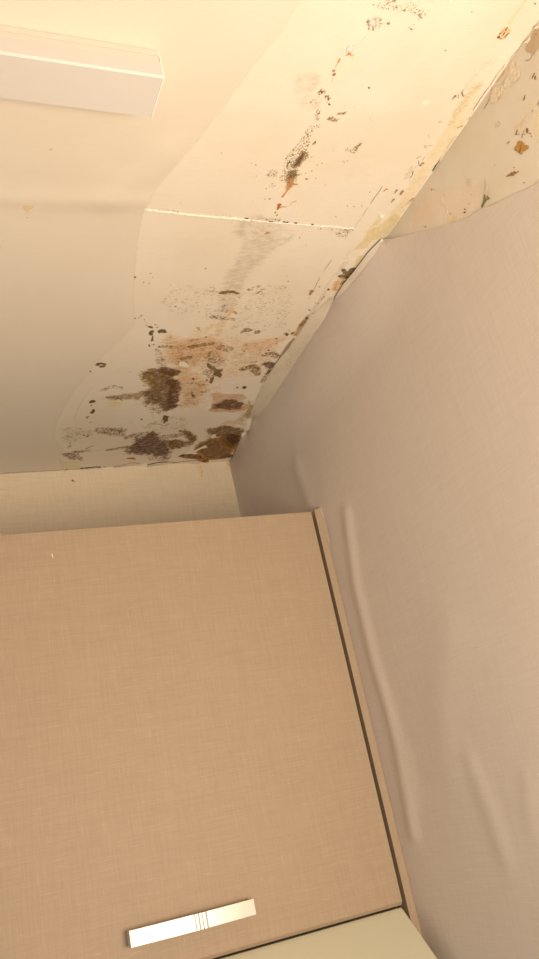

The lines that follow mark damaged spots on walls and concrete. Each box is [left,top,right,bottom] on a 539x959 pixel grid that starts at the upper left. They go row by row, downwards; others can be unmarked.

peeling [523,25,539,61]
leakage [251,112,346,200]
peeling [514,141,529,154]
leakage [104,268,356,413]
leakage [63,425,243,463]